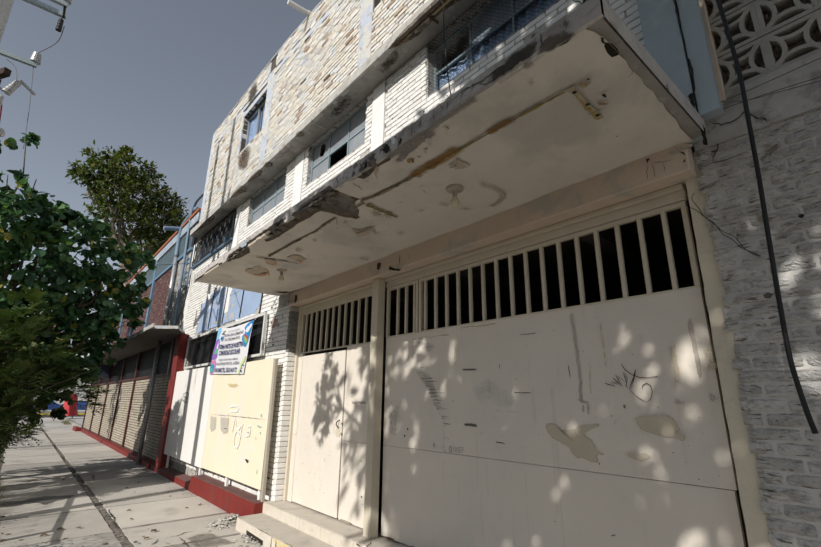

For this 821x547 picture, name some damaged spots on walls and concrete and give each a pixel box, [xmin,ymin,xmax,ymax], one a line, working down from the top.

corrosion [486,120,512,134]
leakage [238,148,250,170]
corrosion [410,148,461,177]
spalling [259,136,402,242]